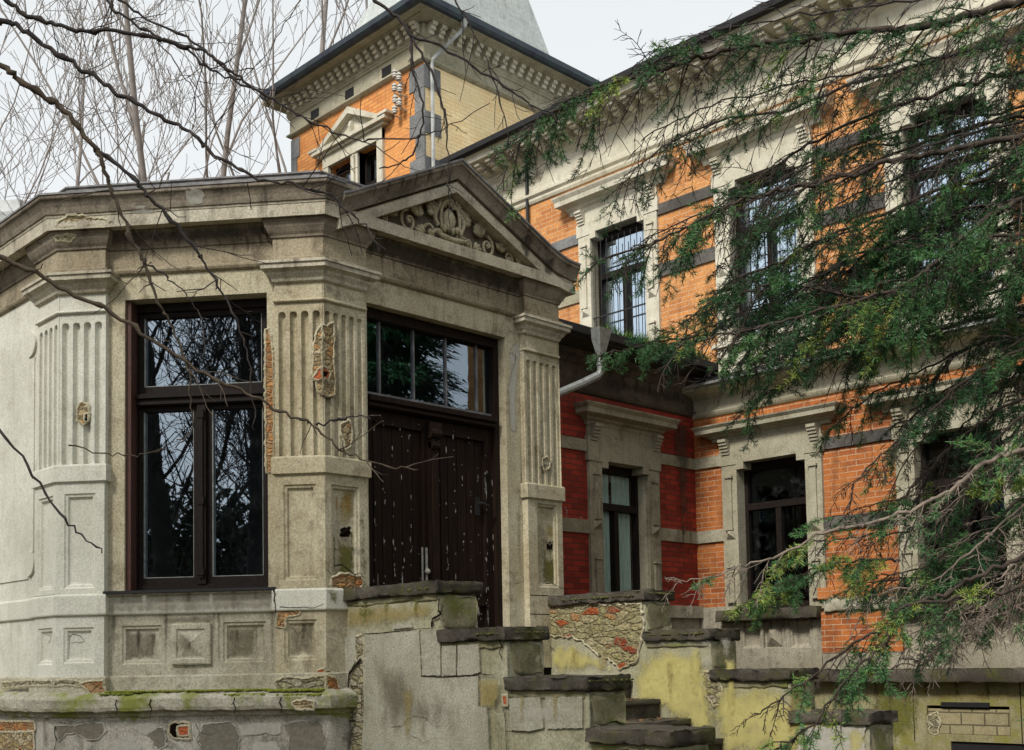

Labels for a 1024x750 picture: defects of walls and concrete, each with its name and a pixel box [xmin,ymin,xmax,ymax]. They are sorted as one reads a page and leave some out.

spalling [310,321,337,398]
spalling [75,401,91,426]
spalling [263,328,275,474]
spalling [339,418,353,451]
spalling [329,572,365,588]
spalling [275,610,302,630]
spalling [550,601,645,671]
spalling [0,719,36,750]
peeling [54,633,365,750]
leakage [637,650,815,750]